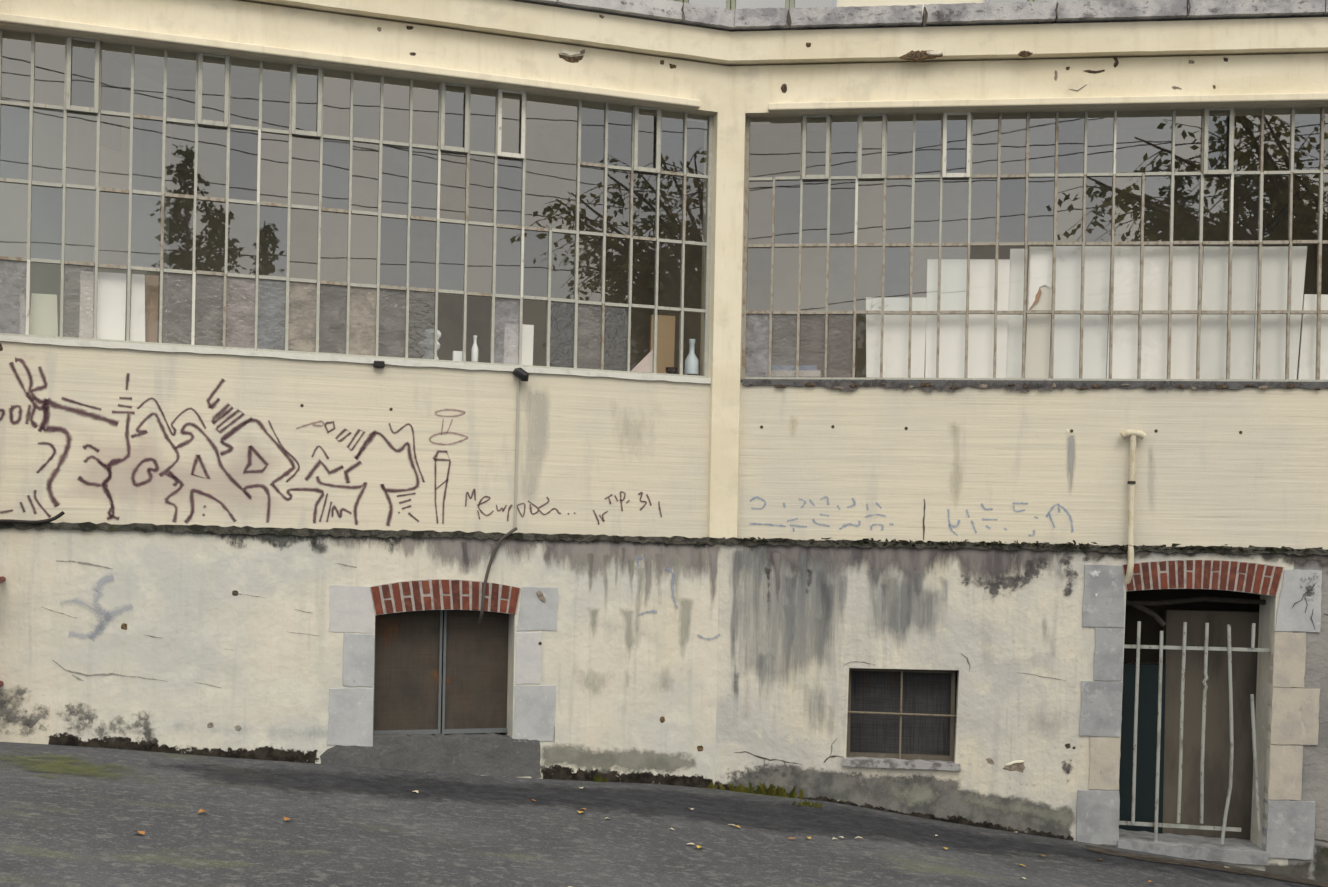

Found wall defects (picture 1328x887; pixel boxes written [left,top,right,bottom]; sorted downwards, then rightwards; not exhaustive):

spalling [559,49,585,63]
spalling [899,50,943,61]
leakage [311,535,719,598]
leakage [681,601,690,642]
leakage [734,544,1078,675]
crack [1292,583,1328,629]
leakage [0,689,48,734]
leakage [66,704,155,741]